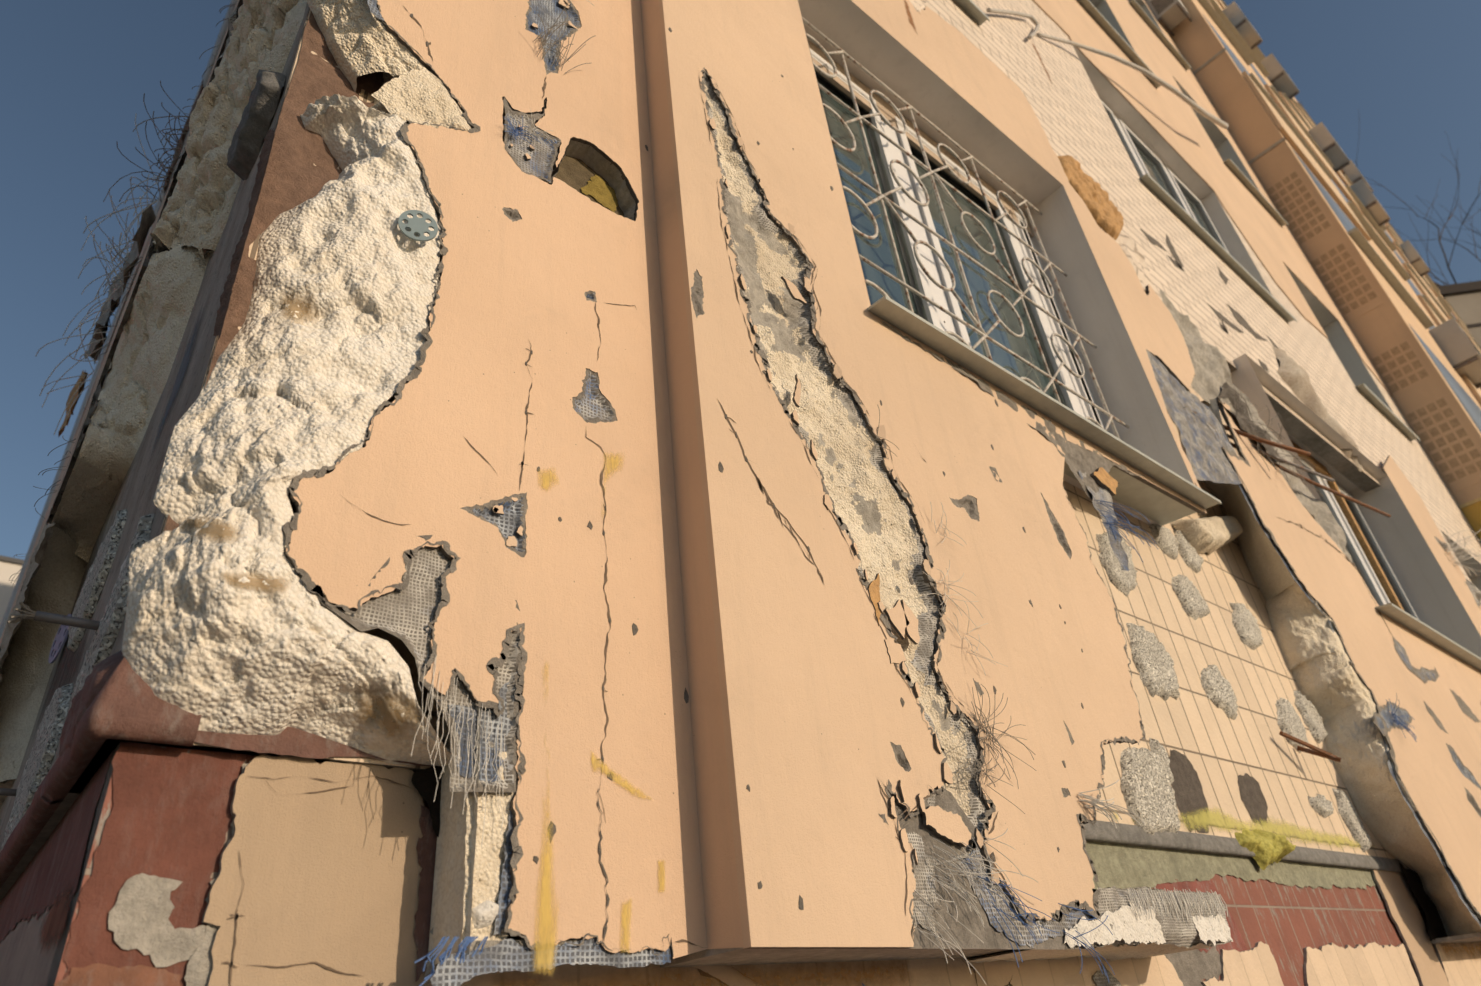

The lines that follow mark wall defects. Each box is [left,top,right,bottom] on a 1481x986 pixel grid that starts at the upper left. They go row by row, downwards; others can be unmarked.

spalling [103,52,220,210]
spalling [204,11,384,389]
crack [595,302,636,361]
spalling [691,270,705,318]
spalling [164,514,180,531]
spalling [283,0,674,983]
crack [718,400,824,583]
spalling [698,68,1378,986]
spalling [1101,228,1481,916]
crack [586,434,612,947]
peeling [108,873,219,986]